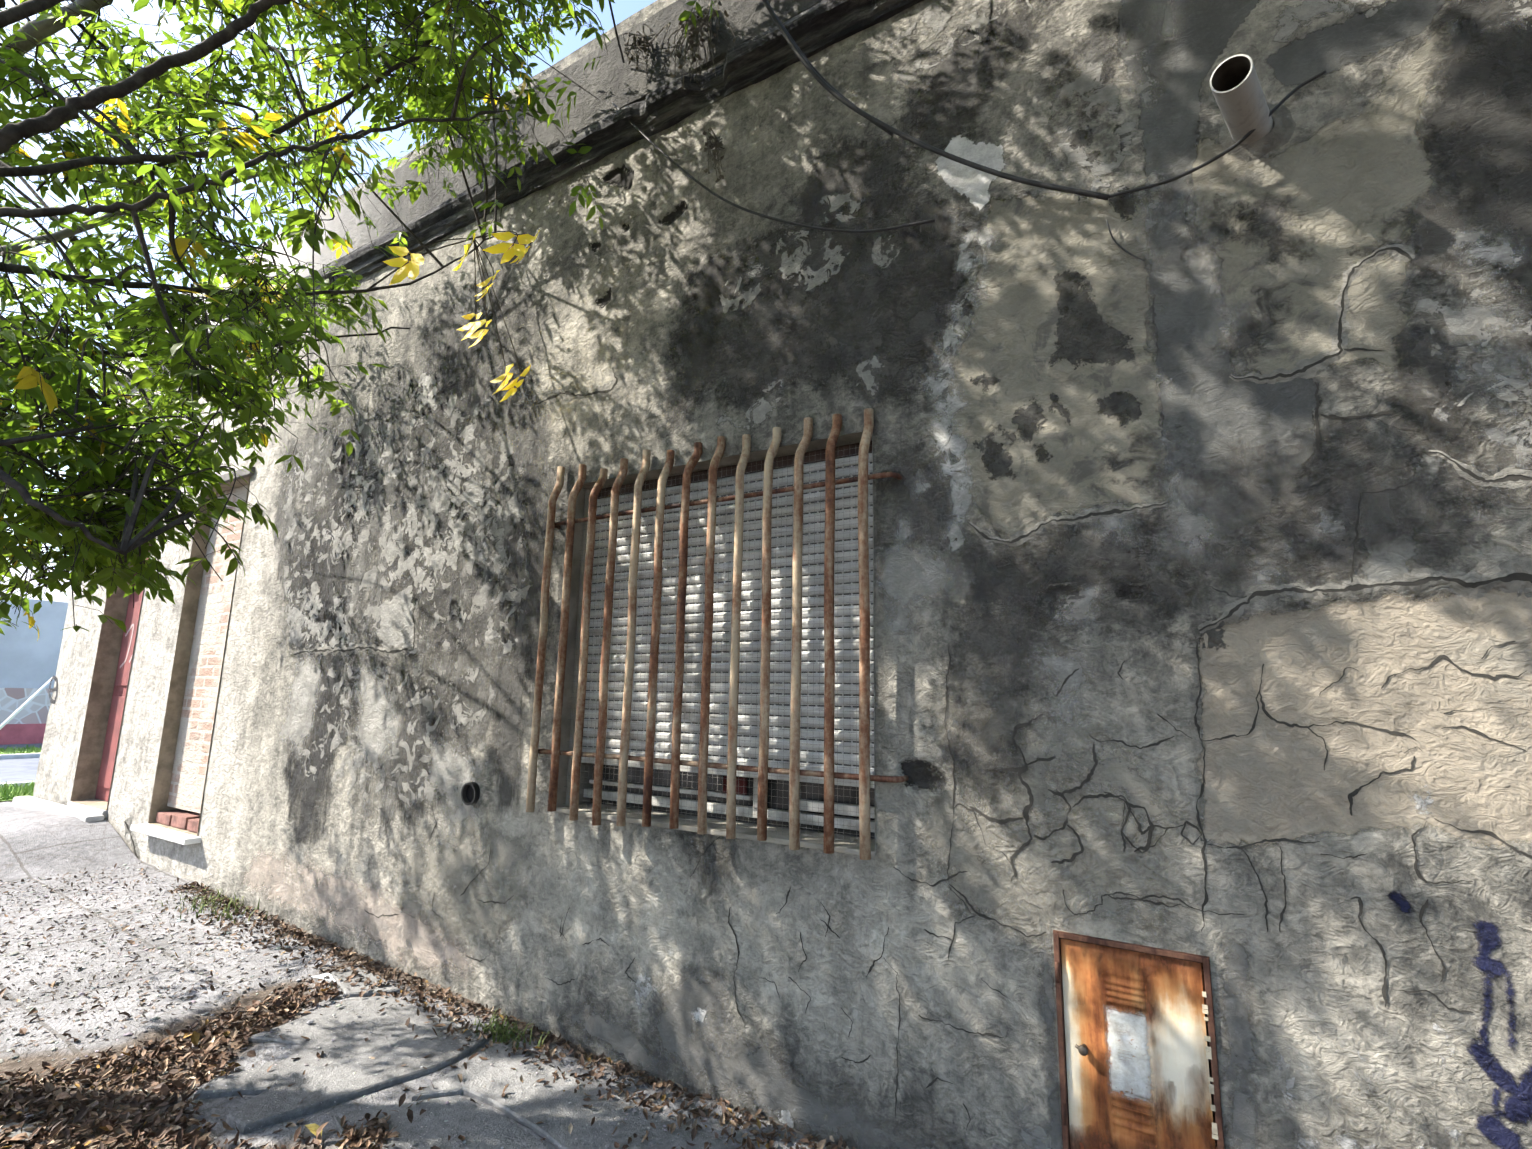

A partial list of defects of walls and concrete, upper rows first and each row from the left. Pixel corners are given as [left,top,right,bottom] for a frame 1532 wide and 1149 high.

peeling [719,189,864,314]
damp [665,0,1056,426]
peeling [934,135,1006,271]
damp [876,0,1532,794]
crack [1229,243,1416,456]
peeling [1411,285,1532,464]
peeling [280,366,531,812]
crack [728,450,1532,1130]
crack [545,907,663,1022]
corrosion [1097,946,1202,1042]
corrosion [1069,1055,1119,1149]
corrosion [1126,1099,1216,1149]